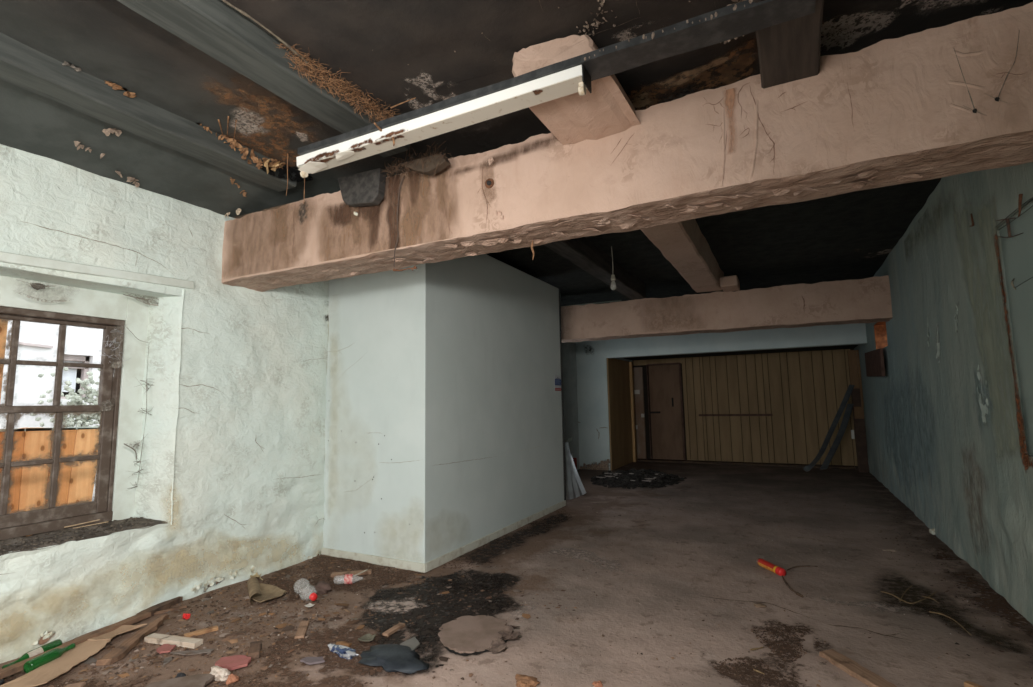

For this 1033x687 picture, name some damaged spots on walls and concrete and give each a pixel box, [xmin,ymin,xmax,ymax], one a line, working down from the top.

peeling [105,81,136,98]
peeling [102,128,122,137]
peeling [196,123,310,176]
water stain [321,169,455,261]